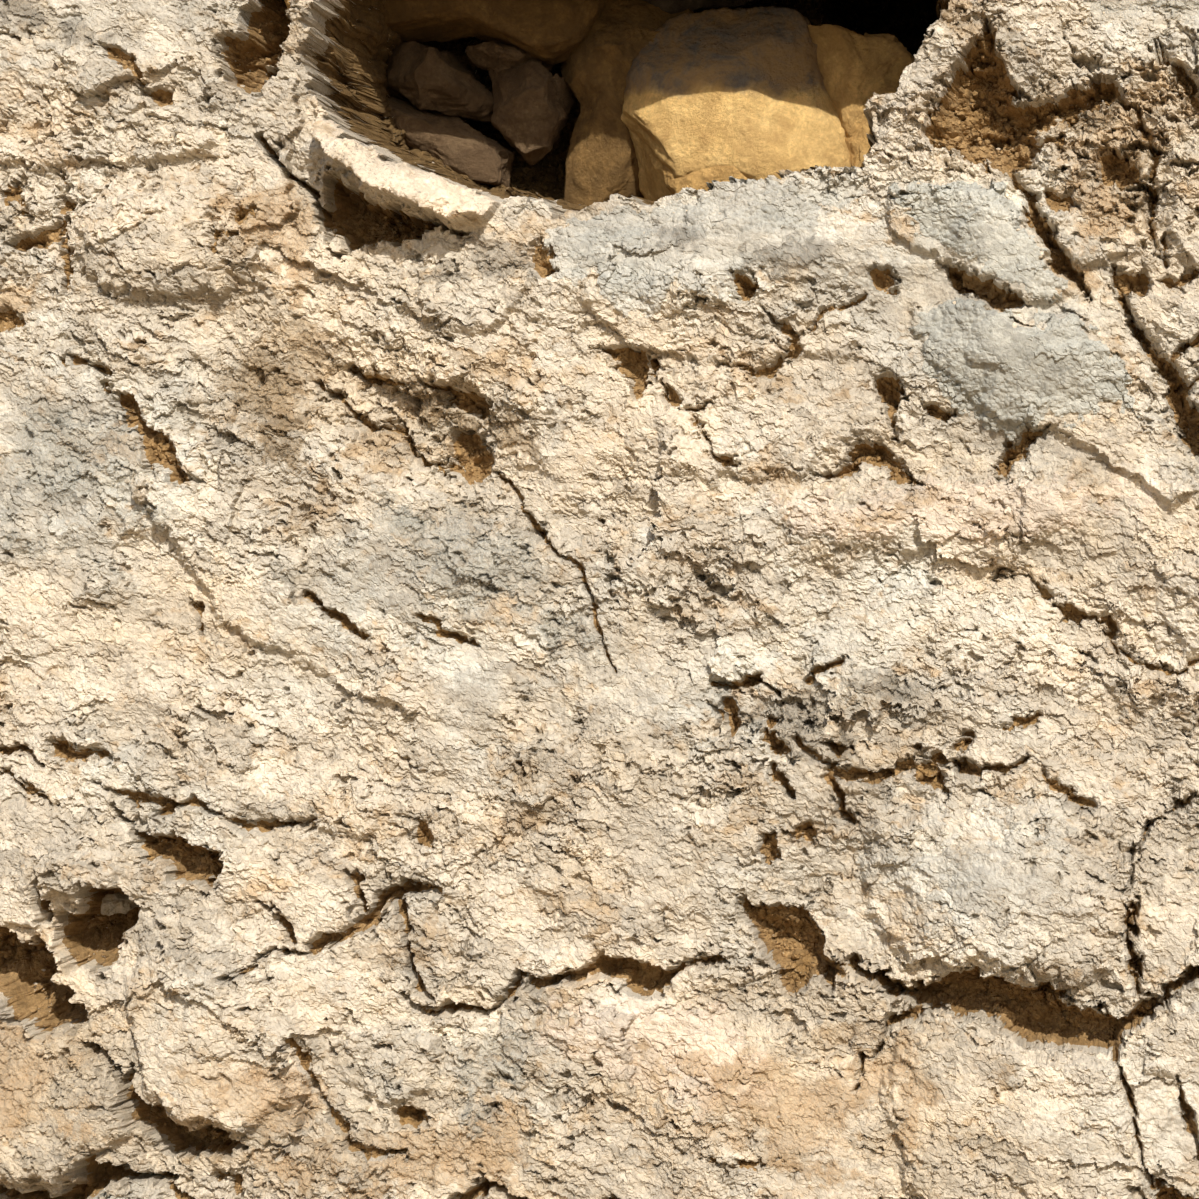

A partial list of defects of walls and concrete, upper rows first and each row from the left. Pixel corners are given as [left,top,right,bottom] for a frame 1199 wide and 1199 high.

spalling [730,0,950,57]
spalling [304,0,868,319]
spalling [870,268,898,295]
crack [1007,169,1199,457]
crack [795,731,1029,794]
crack [1140,792,1196,845]
crack [235,872,726,1015]
crack [456,1162,528,1199]